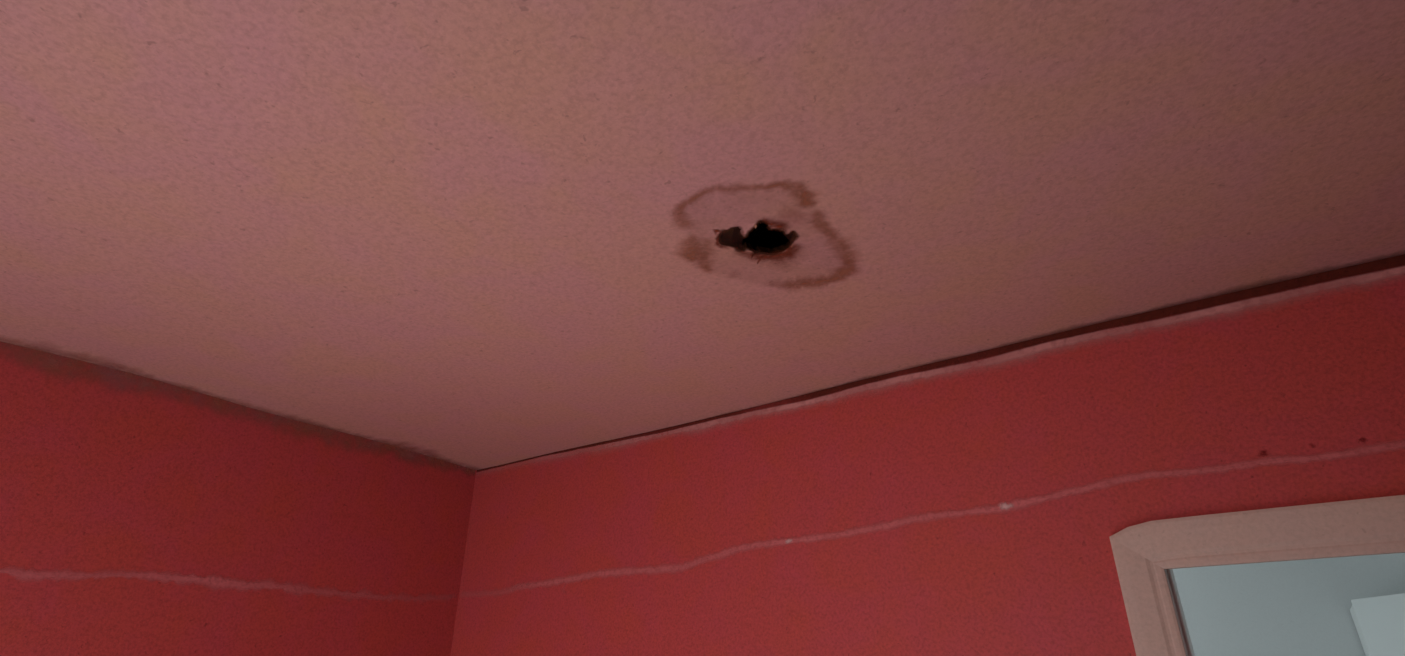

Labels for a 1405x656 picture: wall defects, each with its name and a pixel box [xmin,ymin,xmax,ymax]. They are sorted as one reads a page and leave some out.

spalling [719,220,795,255]
water stain [756,183,854,287]
crack [510,441,1405,591]
crack [0,568,402,600]